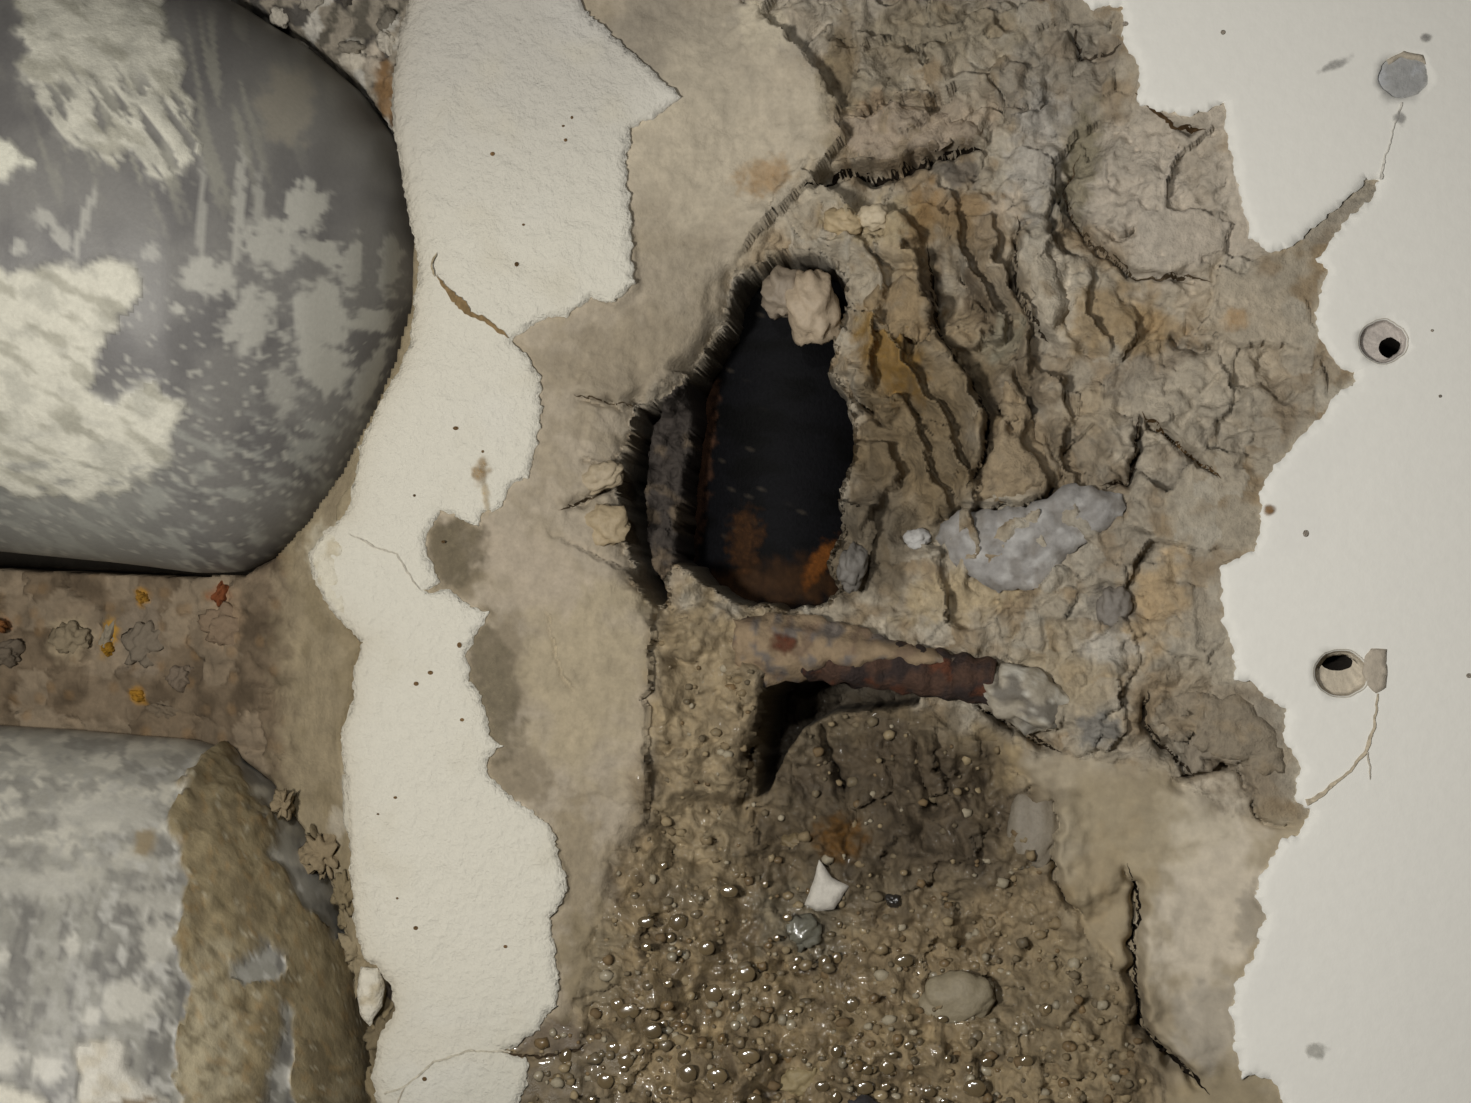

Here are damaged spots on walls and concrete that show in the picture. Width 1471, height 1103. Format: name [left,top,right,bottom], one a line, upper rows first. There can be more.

crack [1135,93,1206,134]
crack [804,146,986,187]
crack [1062,158,1210,282]
crack [431,252,508,338]
crack [1013,216,1048,342]
crack [927,244,991,488]
crack [1101,412,1220,486]
rust [712,513,839,606]
spalling [425,0,1378,1103]
rust [772,635,795,652]
crack [1141,691,1194,776]
crack [1128,868,1209,1094]